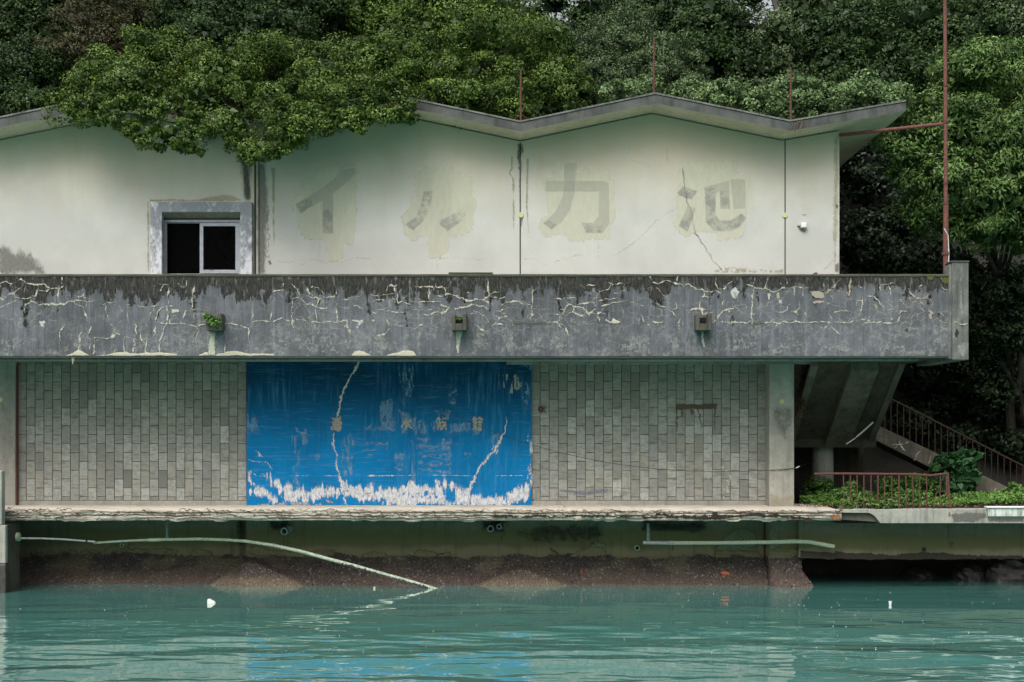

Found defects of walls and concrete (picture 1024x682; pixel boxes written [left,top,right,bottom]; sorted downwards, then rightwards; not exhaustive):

leakage [0,163,966,357]
crack [0,169,968,354]
leakage [510,144,528,225]
peeling [248,365,533,505]